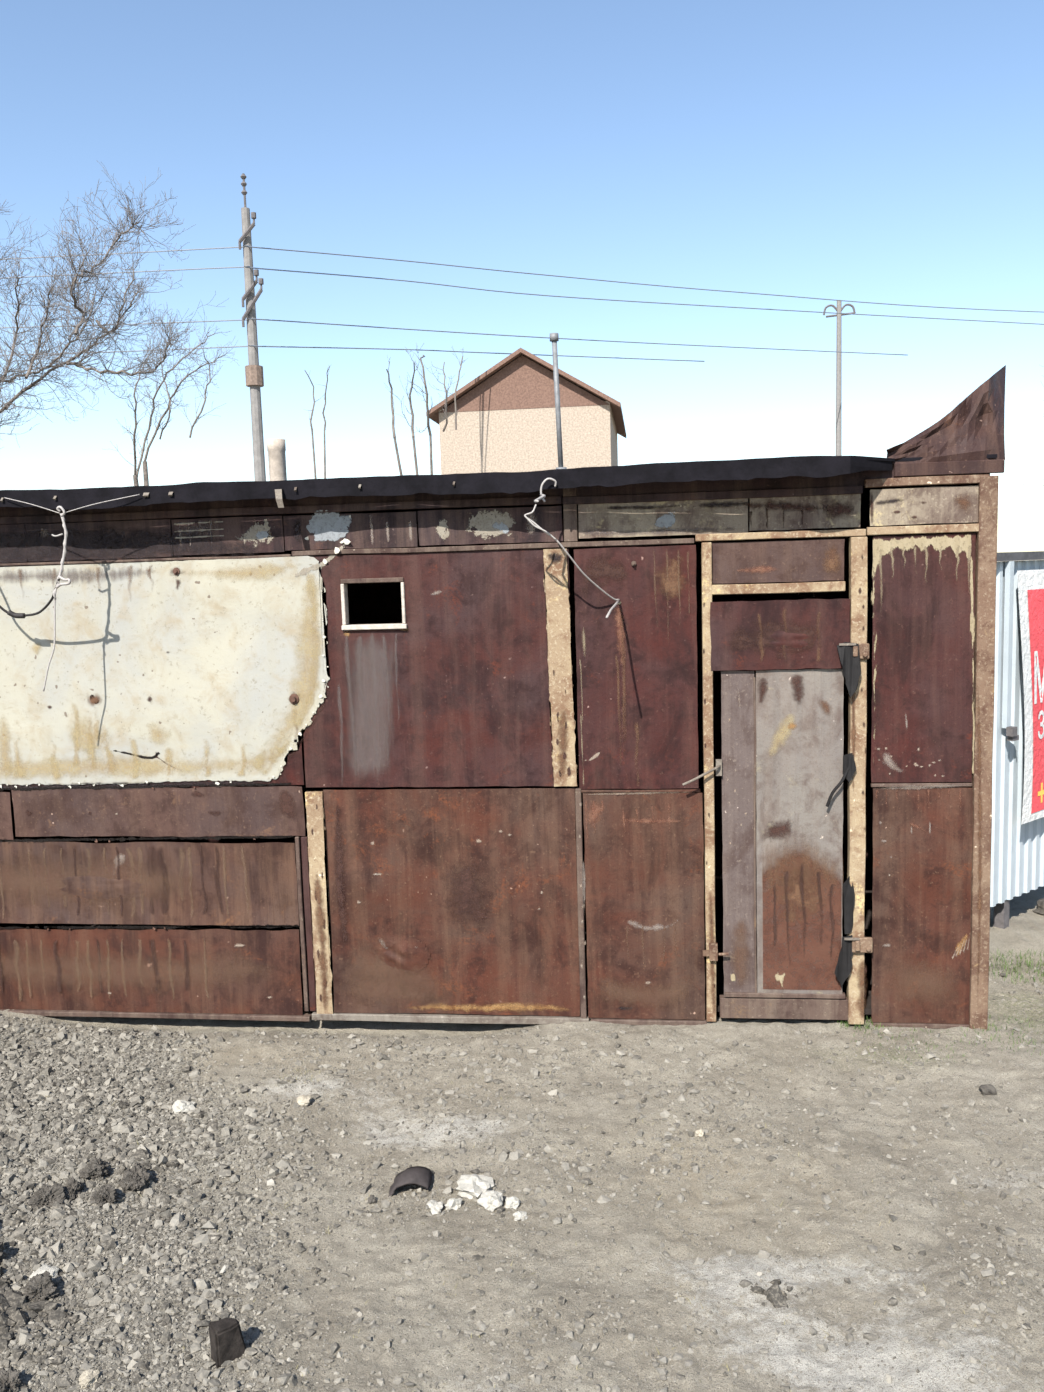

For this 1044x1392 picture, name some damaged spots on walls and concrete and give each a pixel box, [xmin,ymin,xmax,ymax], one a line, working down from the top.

rust [0,528,253,564]
peeling [436,507,516,540]
peeling [0,510,351,789]
rust [616,602,624,663]
peeling [871,534,975,681]
rust [792,675,803,701]
rust [0,762,295,818]
rust [768,821,790,837]
rust [0,835,299,930]
rust [315,808,348,1004]
rust [763,853,842,990]
rust [858,962,867,1017]